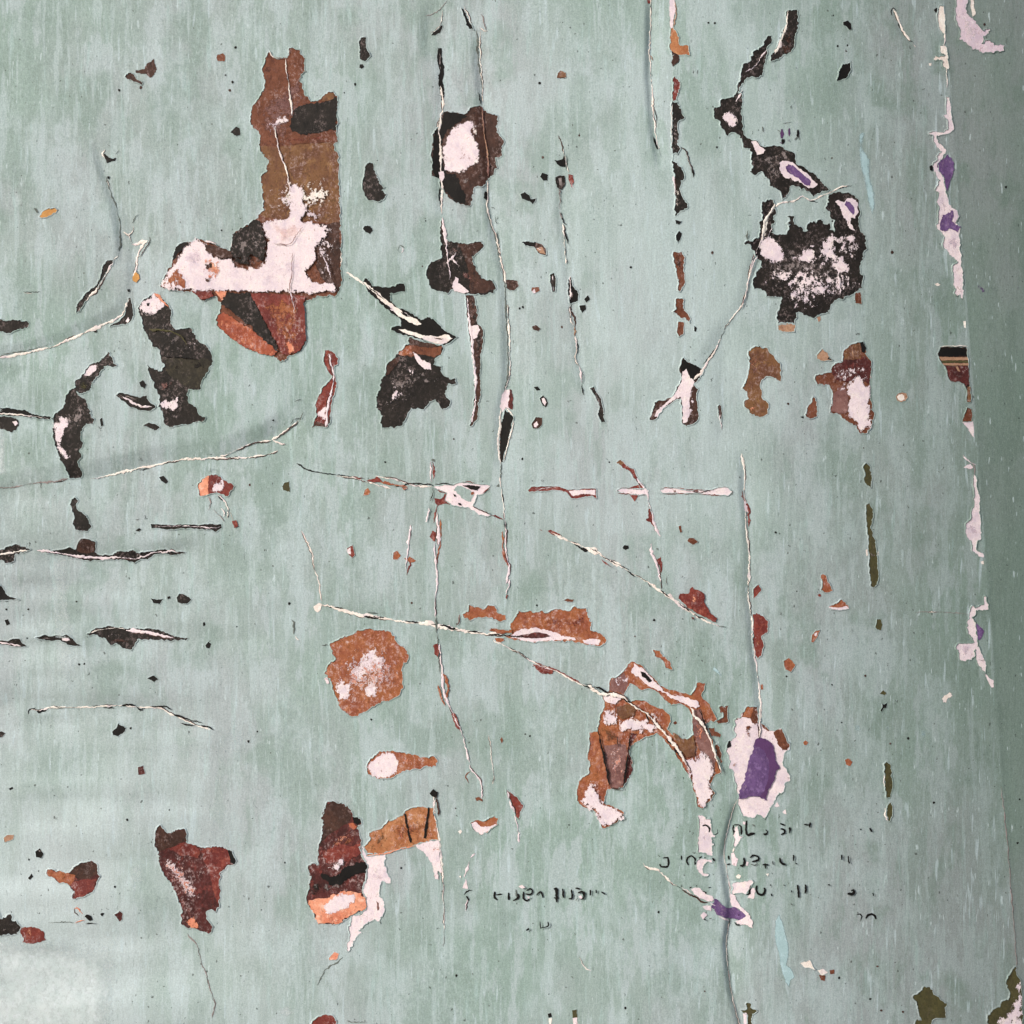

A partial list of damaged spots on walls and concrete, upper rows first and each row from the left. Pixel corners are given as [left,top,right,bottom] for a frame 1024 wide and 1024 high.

crack [476,31,484,105]
peeling [137,46,344,432]
peeling [429,104,506,207]
peeling [425,217,557,297]
peeling [712,9,868,333]
peeling [375,336,457,430]
crack [0,478,68,489]
crack [346,182,762,727]
crack [97,399,592,801]
peeling [575,660,809,830]
peeling [153,823,238,935]
peeling [305,789,442,926]